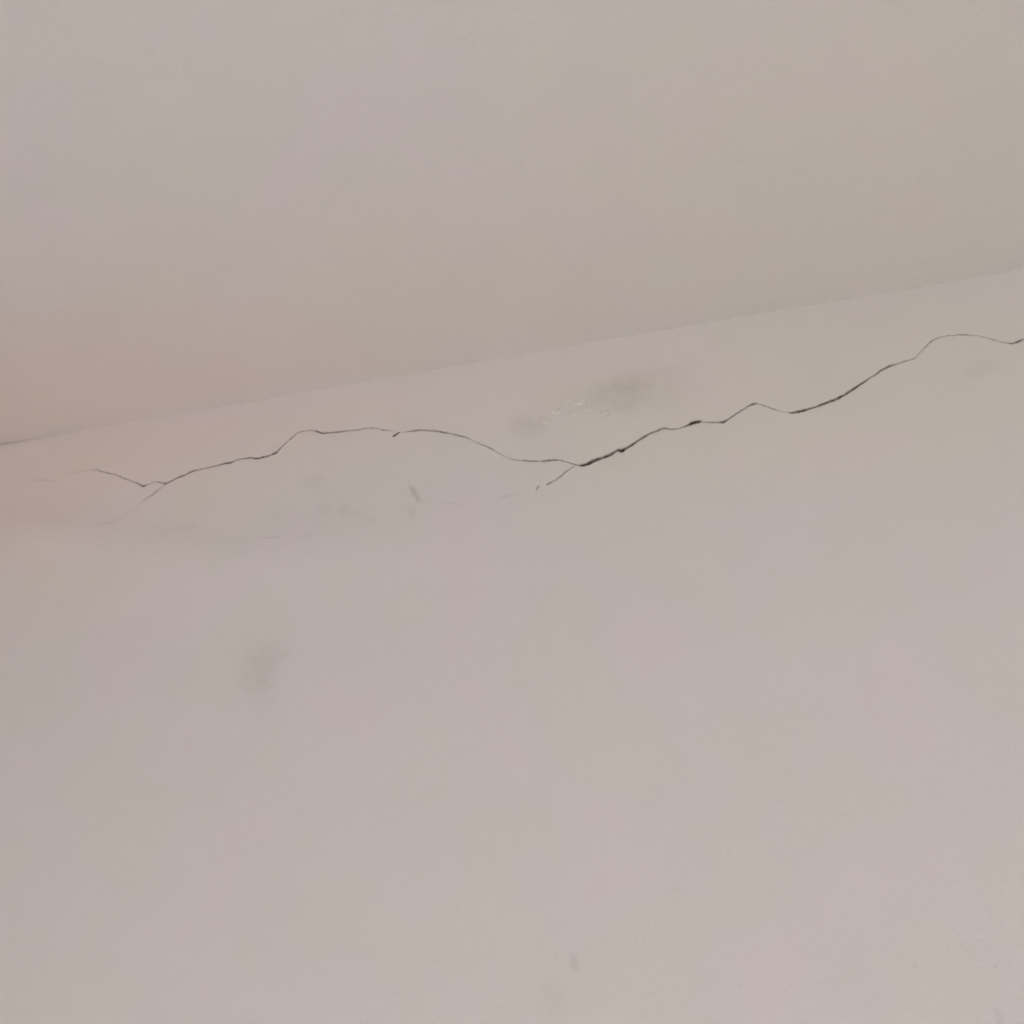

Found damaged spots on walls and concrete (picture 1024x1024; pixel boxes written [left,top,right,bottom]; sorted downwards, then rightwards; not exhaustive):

crack [791,366,891,414]
crack [581,421,726,466]